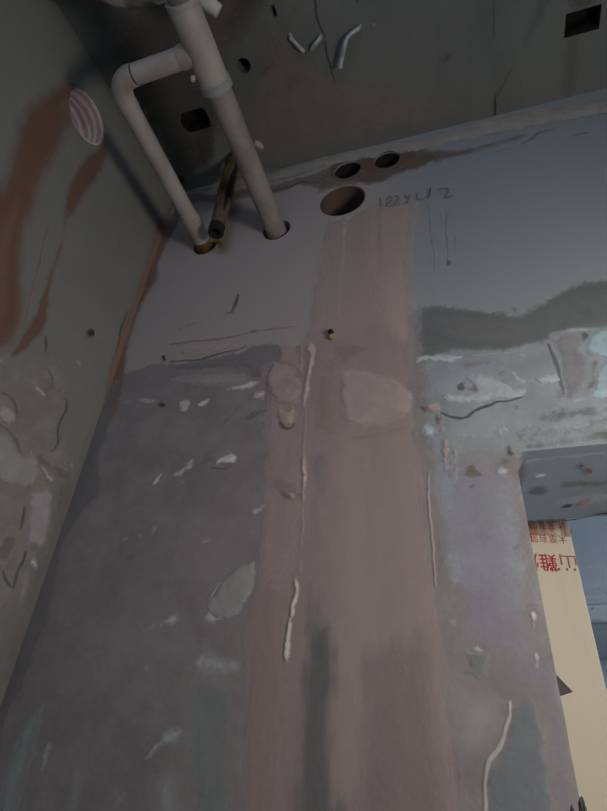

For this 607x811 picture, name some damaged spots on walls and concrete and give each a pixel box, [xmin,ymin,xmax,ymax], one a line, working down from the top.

crack [314,0,335,82]
corrosion [0,86,74,356]
corrosion [65,144,107,222]
crack [441,396,523,419]
spalling [0,344,289,811]
spalling [341,281,607,811]